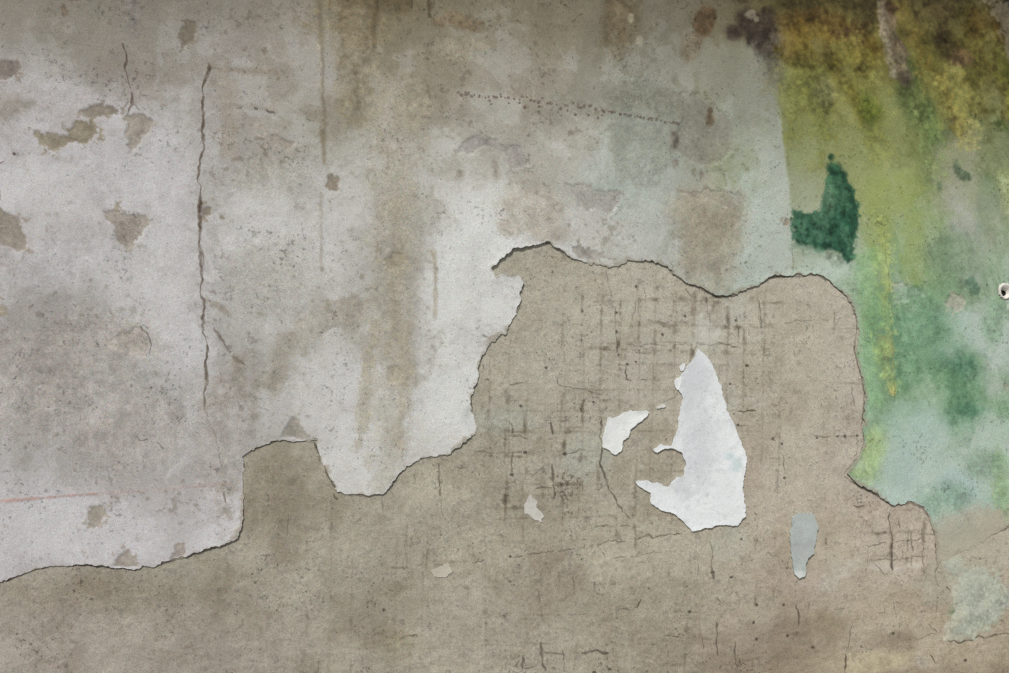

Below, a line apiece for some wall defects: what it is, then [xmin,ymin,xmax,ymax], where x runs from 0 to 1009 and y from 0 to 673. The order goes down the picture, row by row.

leakage [426,0,490,36]
peeling [0,56,158,160]
leakage [678,0,1009,200]
peeling [0,188,34,256]
peeling [91,199,152,252]
leakage [0,0,439,561]
crack [197,63,245,503]
leakage [786,241,847,269]
leakage [822,152,854,219]
leakage [950,400,989,419]
flaking render [0,236,1009,673]
crack [866,512,951,592]